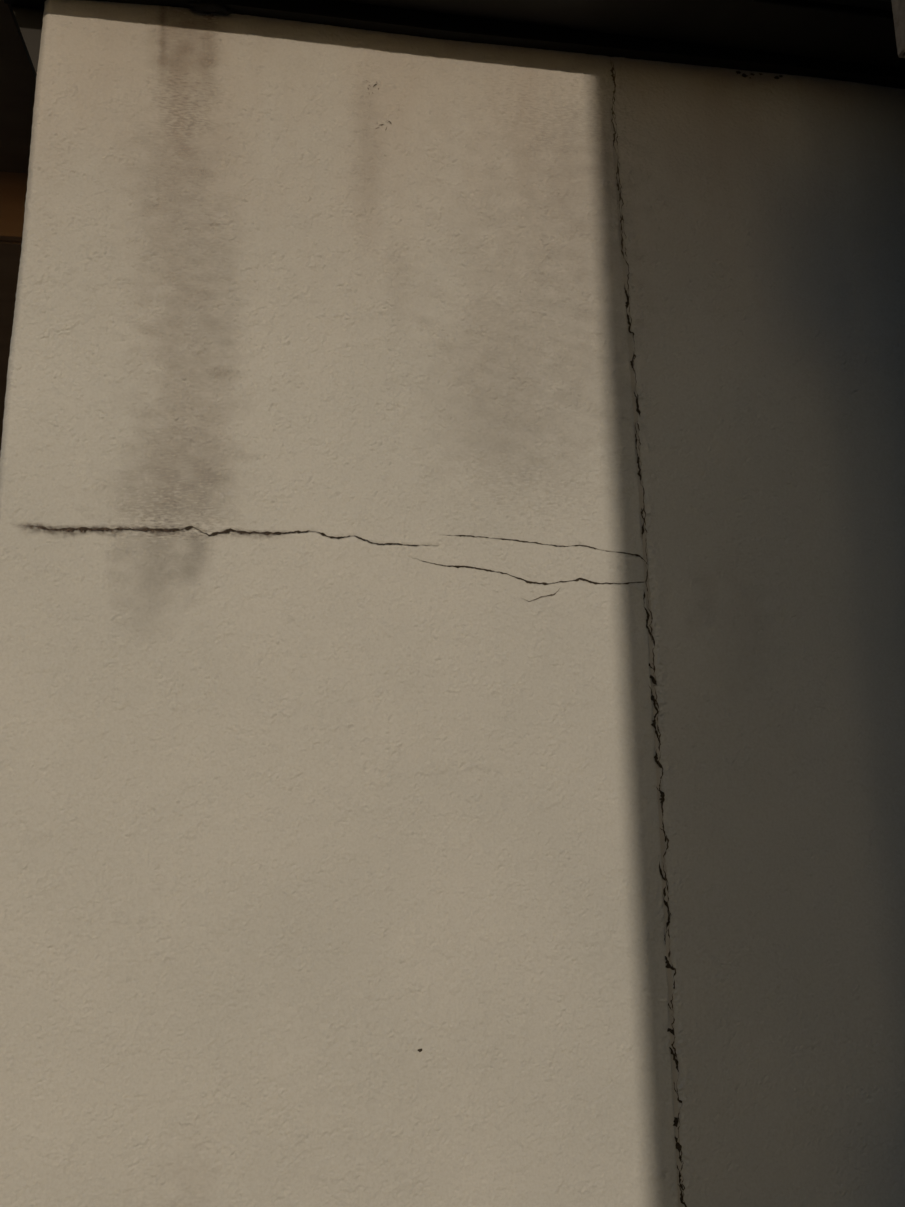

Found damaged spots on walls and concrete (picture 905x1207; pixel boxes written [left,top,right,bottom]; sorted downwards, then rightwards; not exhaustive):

leakage [26,524,169,532]
crack [23,58,687,1207]